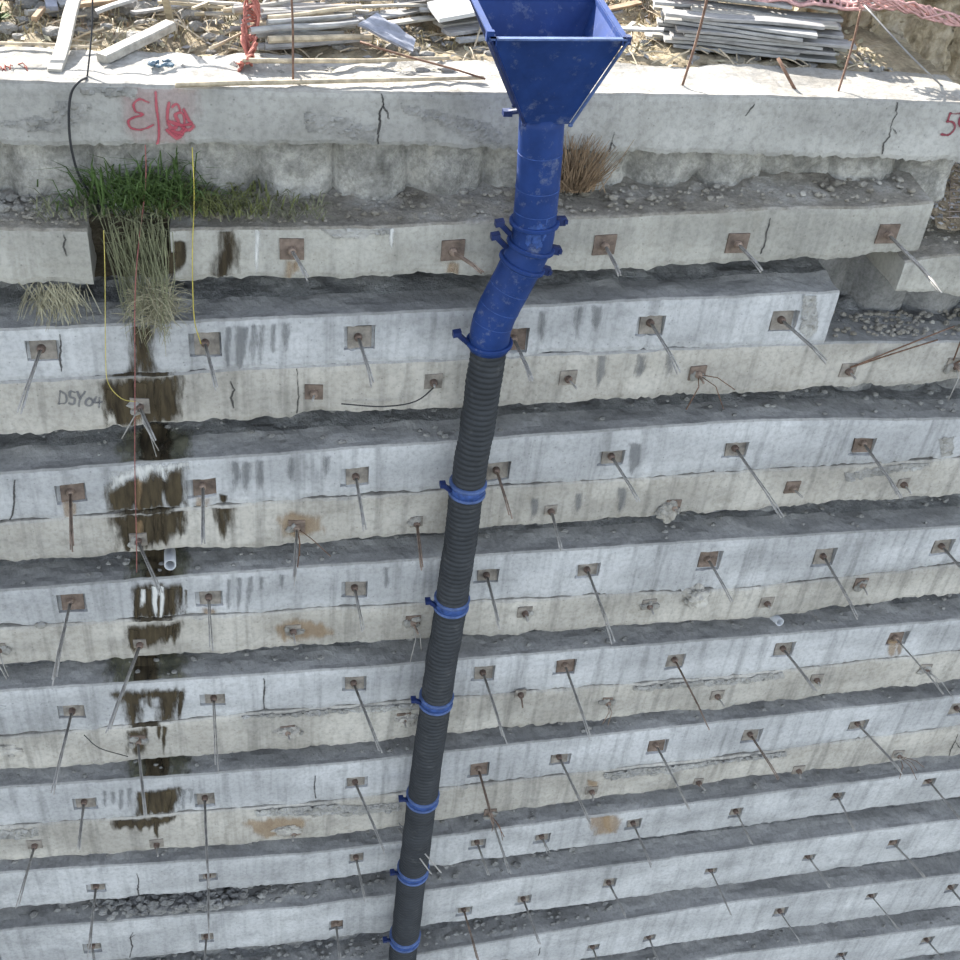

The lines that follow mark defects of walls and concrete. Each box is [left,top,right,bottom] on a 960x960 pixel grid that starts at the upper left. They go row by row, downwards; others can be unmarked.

crack [882,103,898,154]
leakage [102,325,184,426]
leakage [105,463,187,552]
leakage [128,583,187,652]
leakage [112,689,184,755]
leakage [112,787,184,838]
spalling [254,802,401,818]